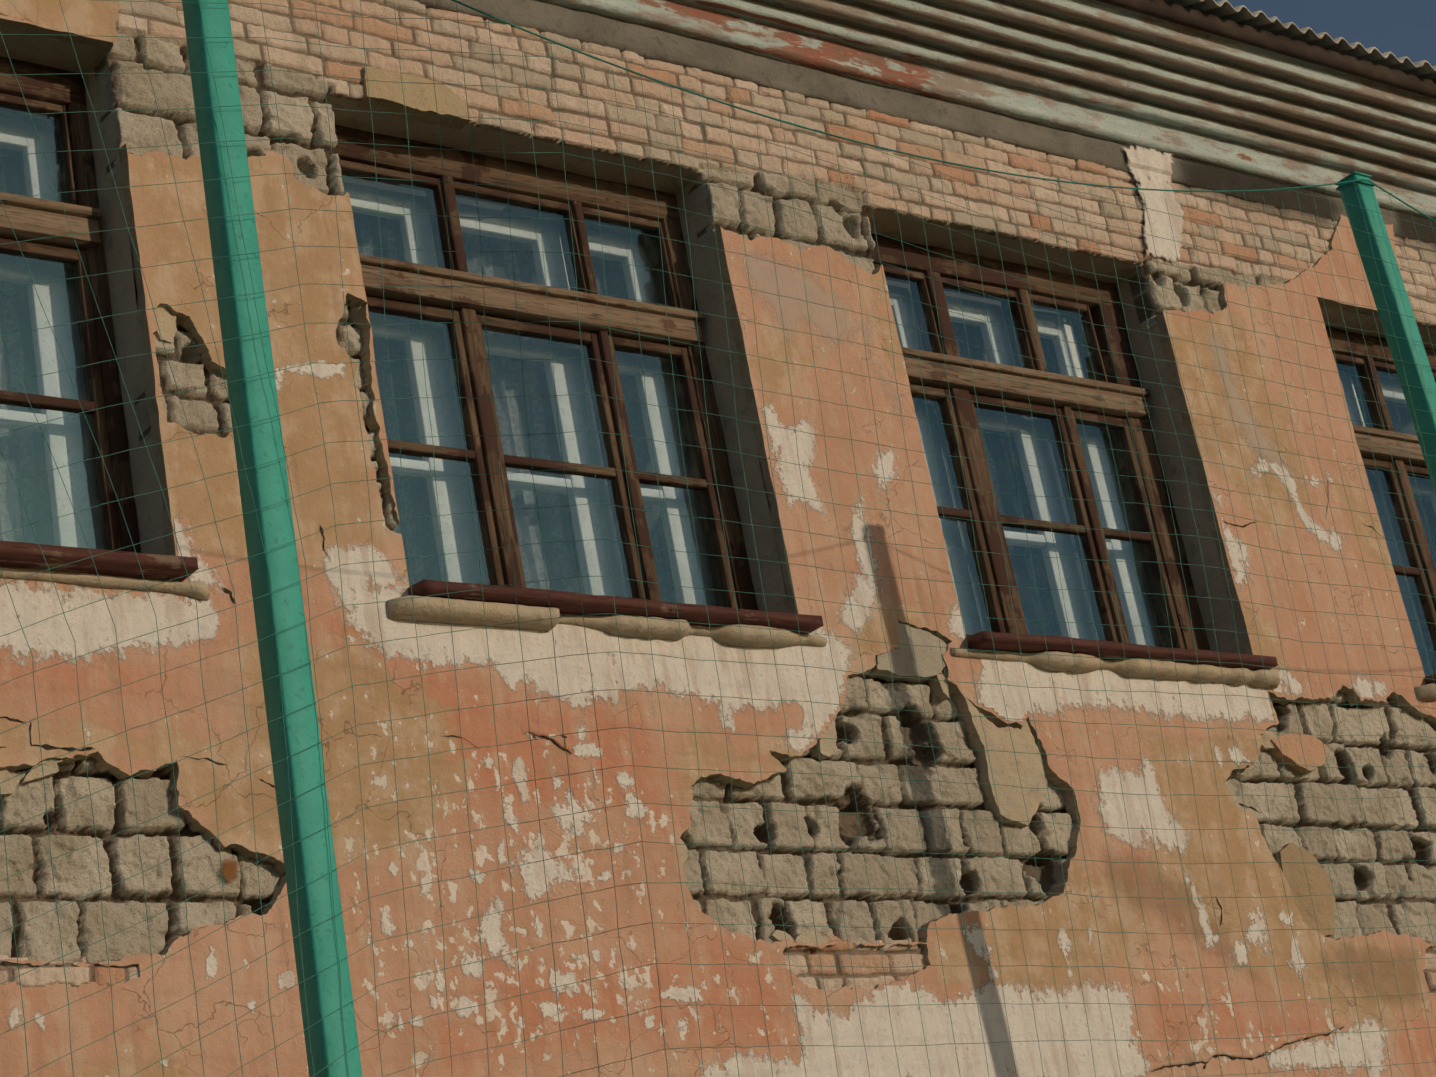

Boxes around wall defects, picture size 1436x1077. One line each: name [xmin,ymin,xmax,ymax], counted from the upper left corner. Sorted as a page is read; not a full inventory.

spalling [94,0,200,181]
spalling [228,0,1338,333]
peeling [0,518,224,666]
spalling [133,306,233,446]
spalling [275,299,398,531]
peeling [762,404,827,517]
peeling [1212,493,1253,591]
crack [0,716,94,751]
spalling [0,756,285,987]
spalling [321,444,1151,1077]
spalling [973,652,1436,997]
crack [1144,1017,1345,1072]